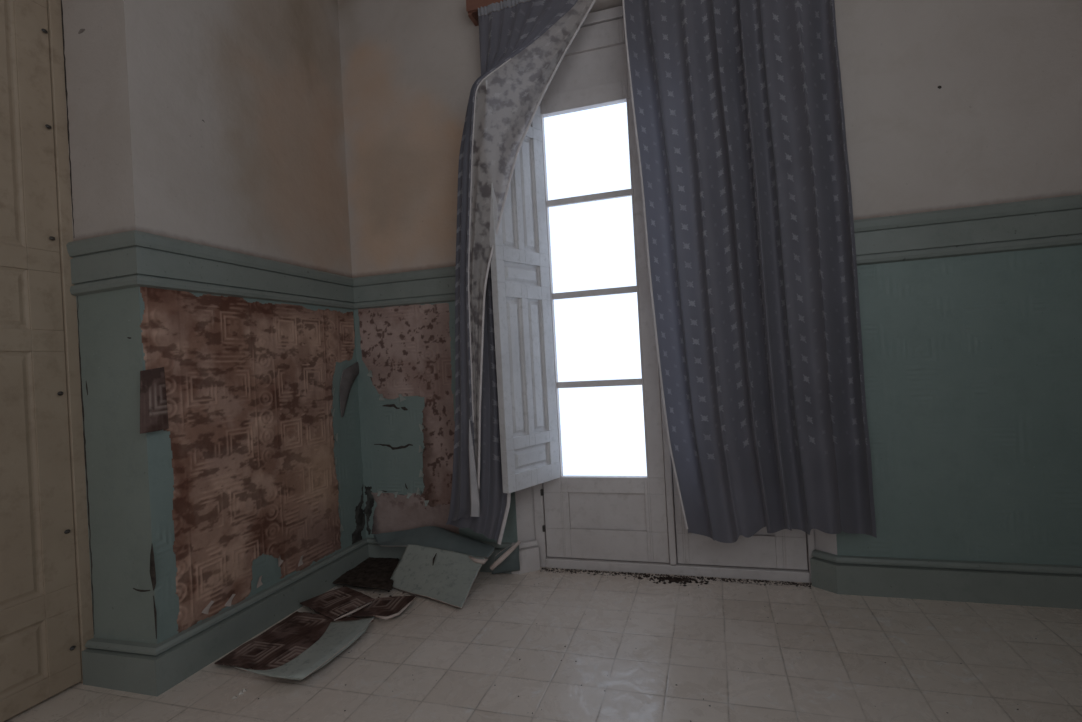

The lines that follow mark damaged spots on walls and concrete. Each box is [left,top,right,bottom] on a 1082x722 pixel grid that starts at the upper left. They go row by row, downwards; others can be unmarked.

crack [61,0,74,231]
crack [77,296,94,628]
peeling [140,287,460,633]